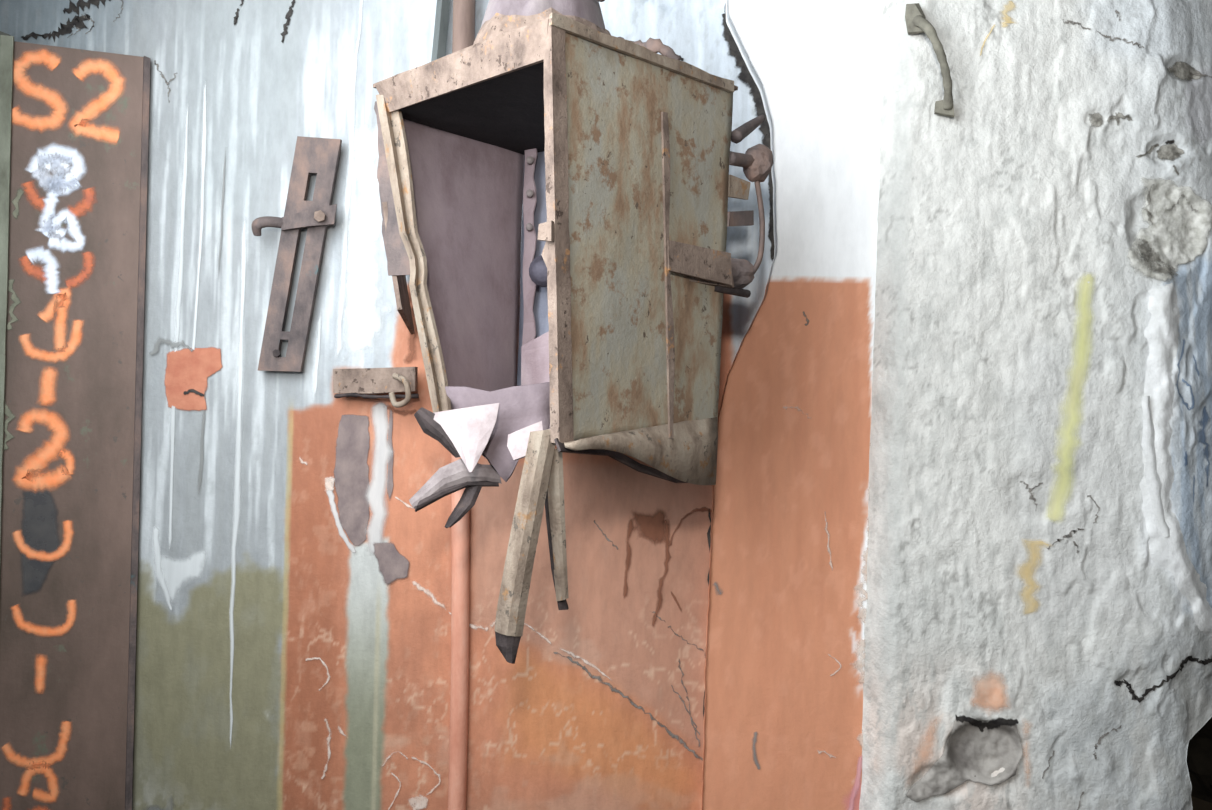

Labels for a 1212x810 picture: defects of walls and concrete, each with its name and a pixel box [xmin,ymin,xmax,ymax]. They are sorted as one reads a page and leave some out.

crack [21,0,123,42]
crack [722,3,775,260]
spalling [1127,140,1212,281]
flaking render [150,338,222,411]
peeling [325,403,409,584]
crack [705,509,713,585]
crack [554,612,706,760]
spalling [906,675,1029,802]
crack [1093,726,1121,759]
crack [1114,656,1212,703]